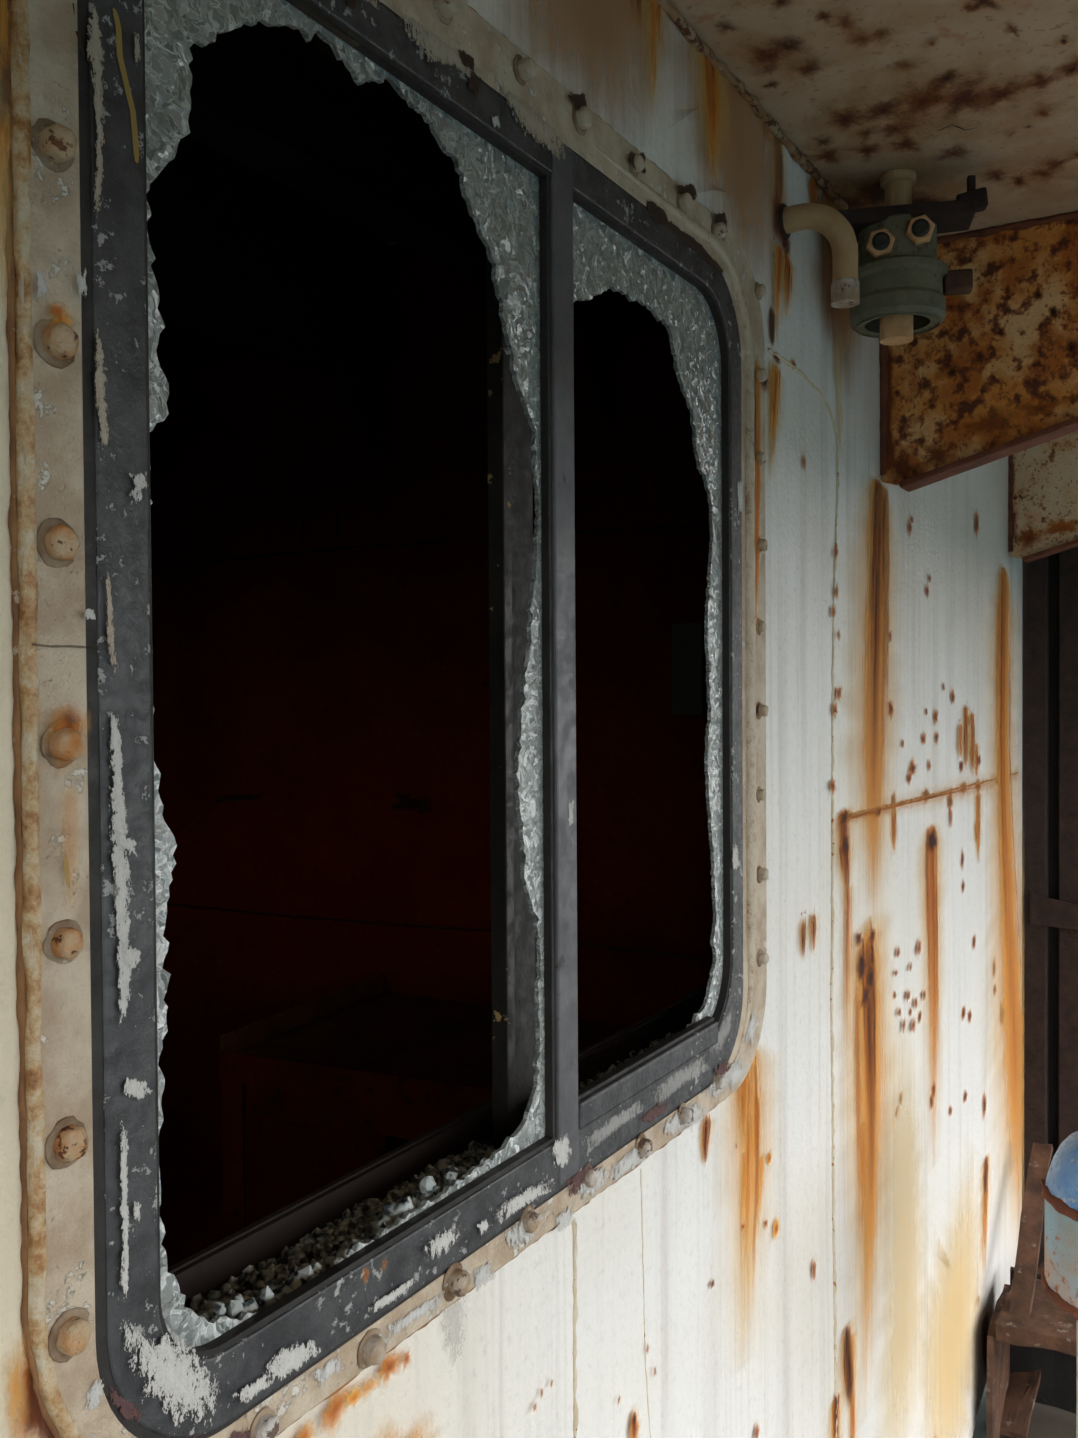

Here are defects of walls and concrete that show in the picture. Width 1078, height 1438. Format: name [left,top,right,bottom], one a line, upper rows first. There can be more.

rust [756,40,820,88]
rust [818,63,1078,161]
rust [1012,472,1076,547]
peeling [108,711,141,1023]
rust [840,347,1024,1309]
peeling [123,1077,152,1100]
peeling [118,1117,141,1302]
rust [736,1051,779,1260]
peeling [379,1283,448,1345]
peeling [85,1320,344,1438]
rust [298,1351,410,1438]
rust [833,1327,855,1438]